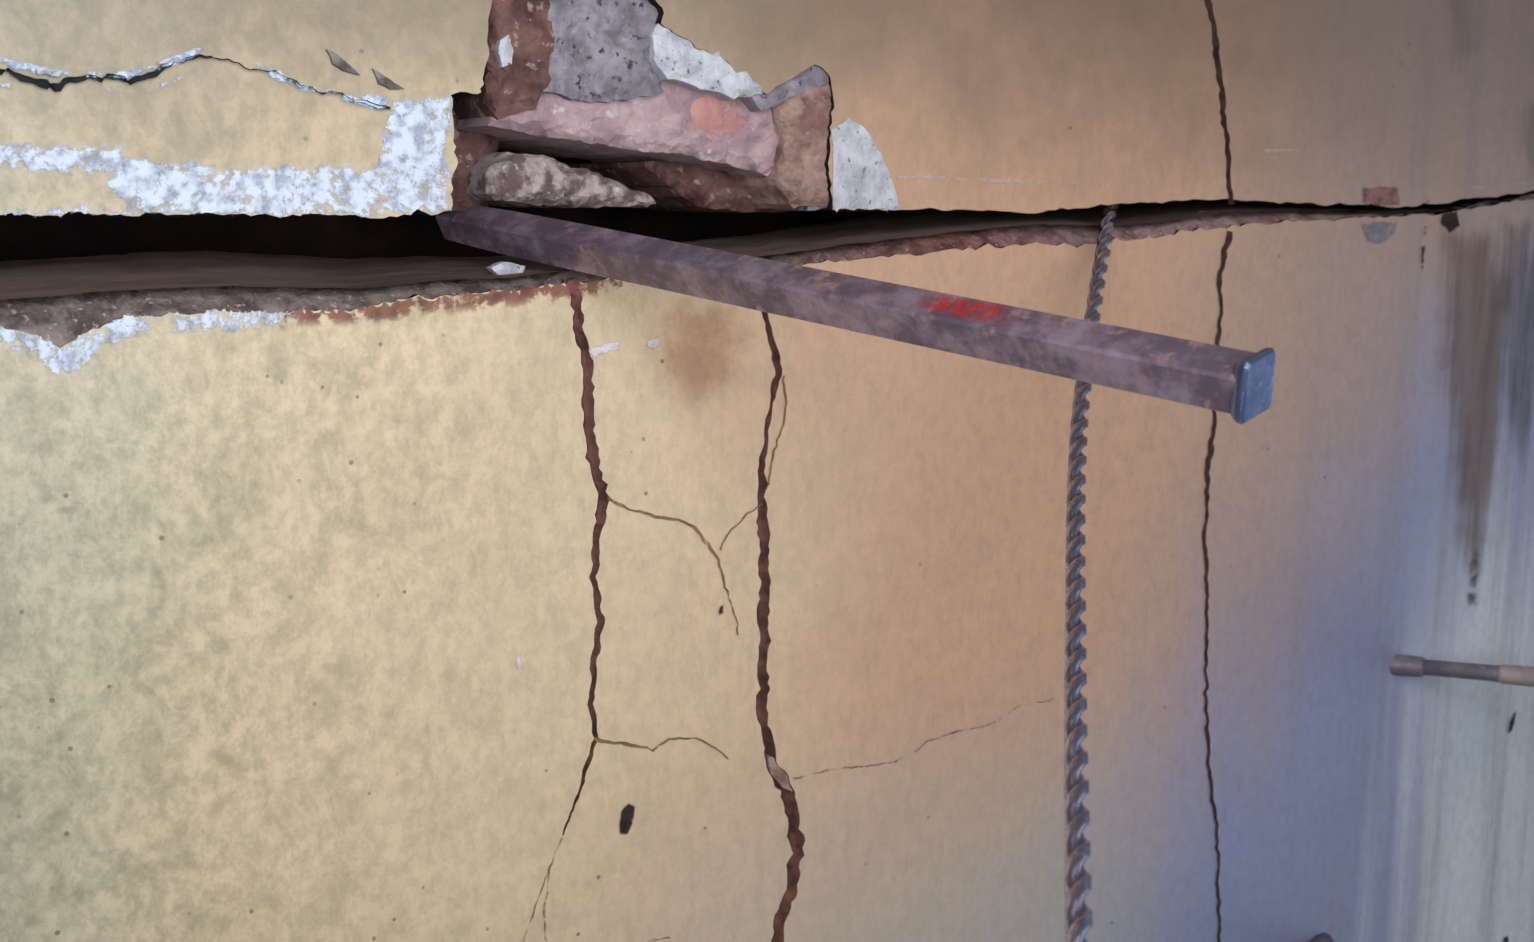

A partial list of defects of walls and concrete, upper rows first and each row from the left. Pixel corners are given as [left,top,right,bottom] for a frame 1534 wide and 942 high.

spalling [0,315,149,375]
spalling [174,309,288,331]
spalling [0,0,900,217]
crack [680,0,1534,346]
water stain [1454,241,1503,602]
crack [0,250,990,942]
crack [1202,410,1222,942]